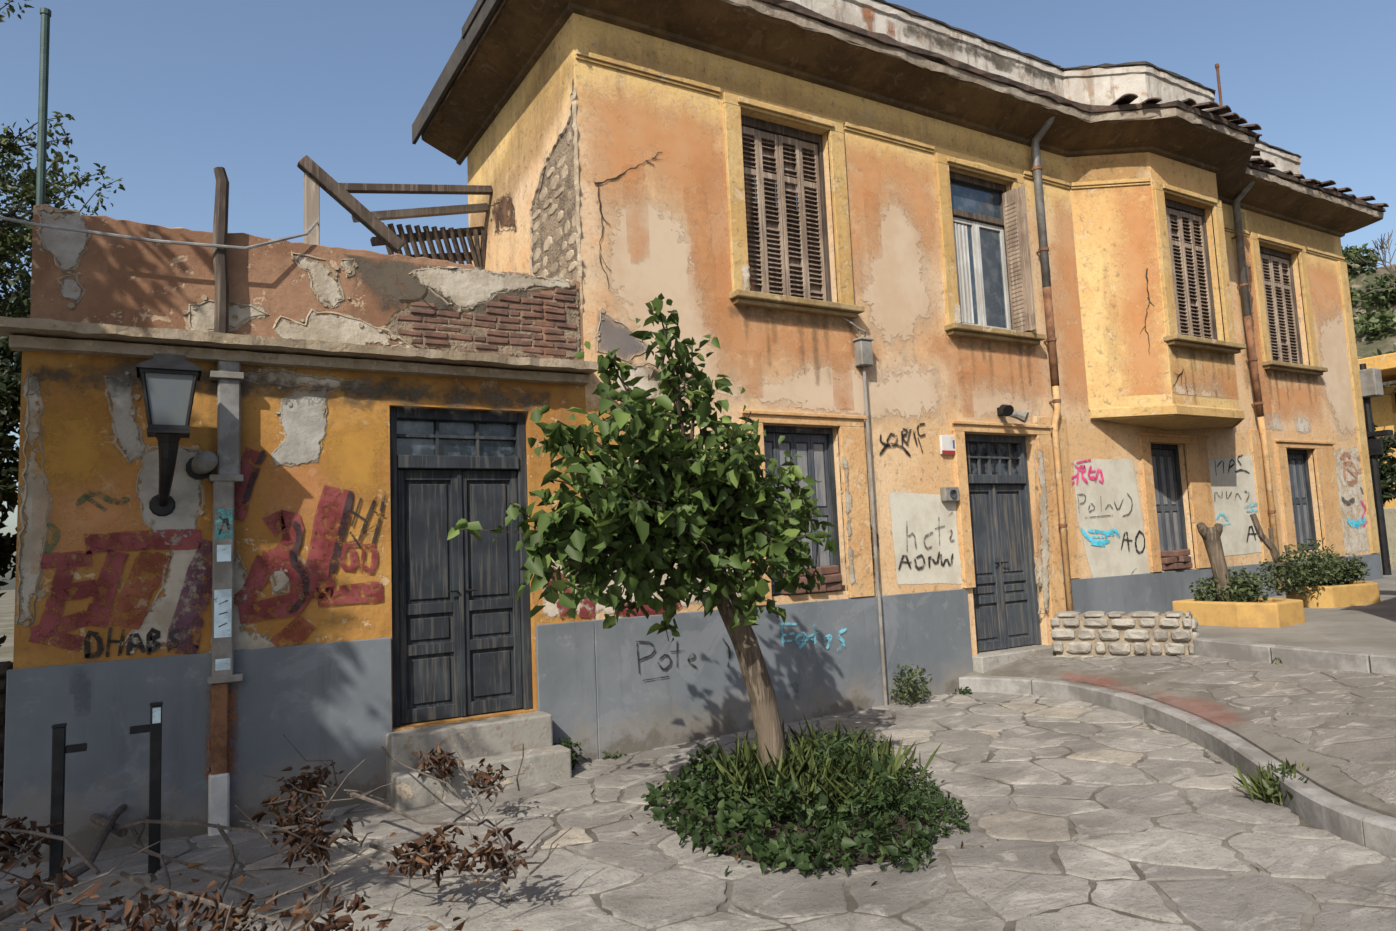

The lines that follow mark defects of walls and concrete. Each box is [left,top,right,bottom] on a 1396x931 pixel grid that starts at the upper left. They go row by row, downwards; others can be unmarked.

crack [594,152,662,287]
flaking render [377,281,688,400]
crack [1140,268,1188,392]
flaking render [14,370,54,627]